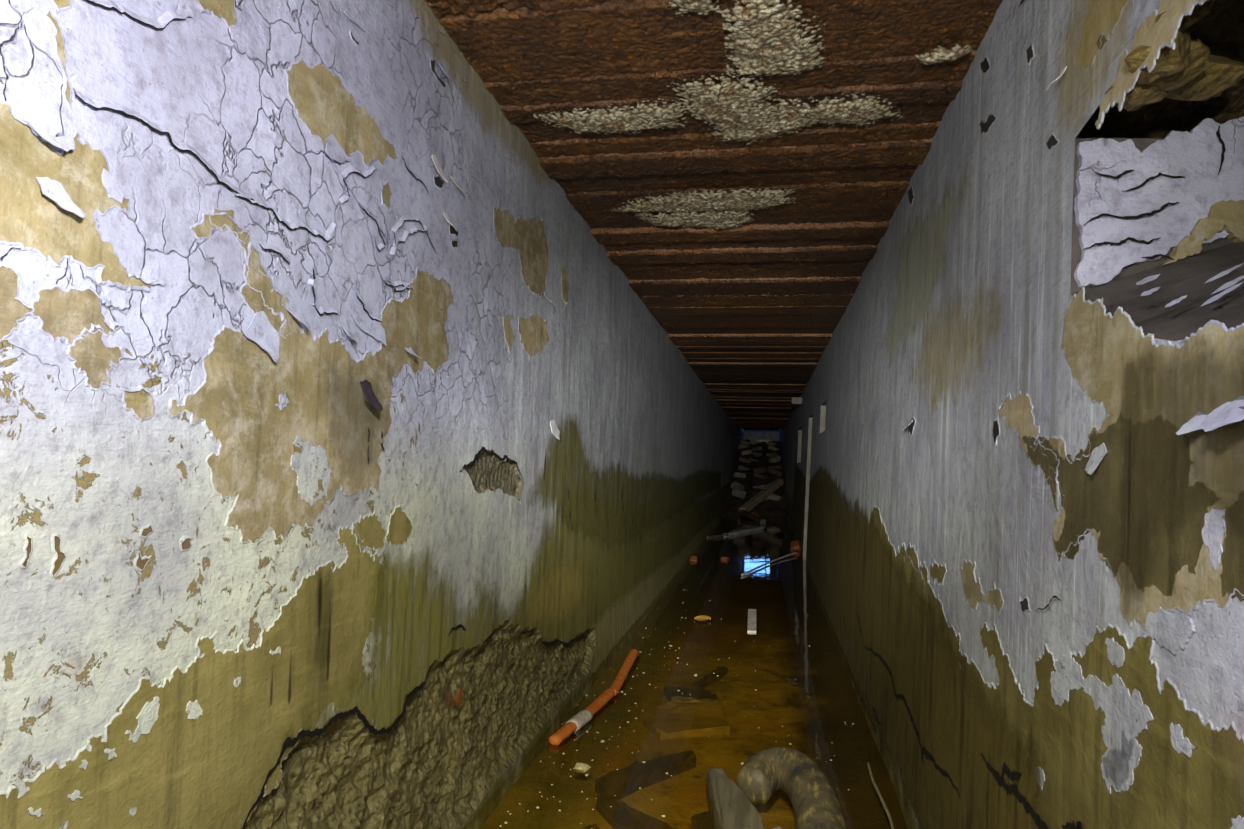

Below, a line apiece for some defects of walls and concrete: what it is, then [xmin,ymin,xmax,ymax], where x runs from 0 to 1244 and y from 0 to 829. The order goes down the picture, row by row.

peeling [43,0,73,114]
crack [86,0,187,30]
crack [74,88,437,322]
peeling [283,58,398,210]
peeling [0,101,453,545]
spalling [460,446,522,504]
peeling [869,0,1244,829]
peeling [0,504,596,829]
damp [291,419,729,829]
crack [858,614,960,797]
damp [791,466,1038,829]
crack [981,754,1083,829]